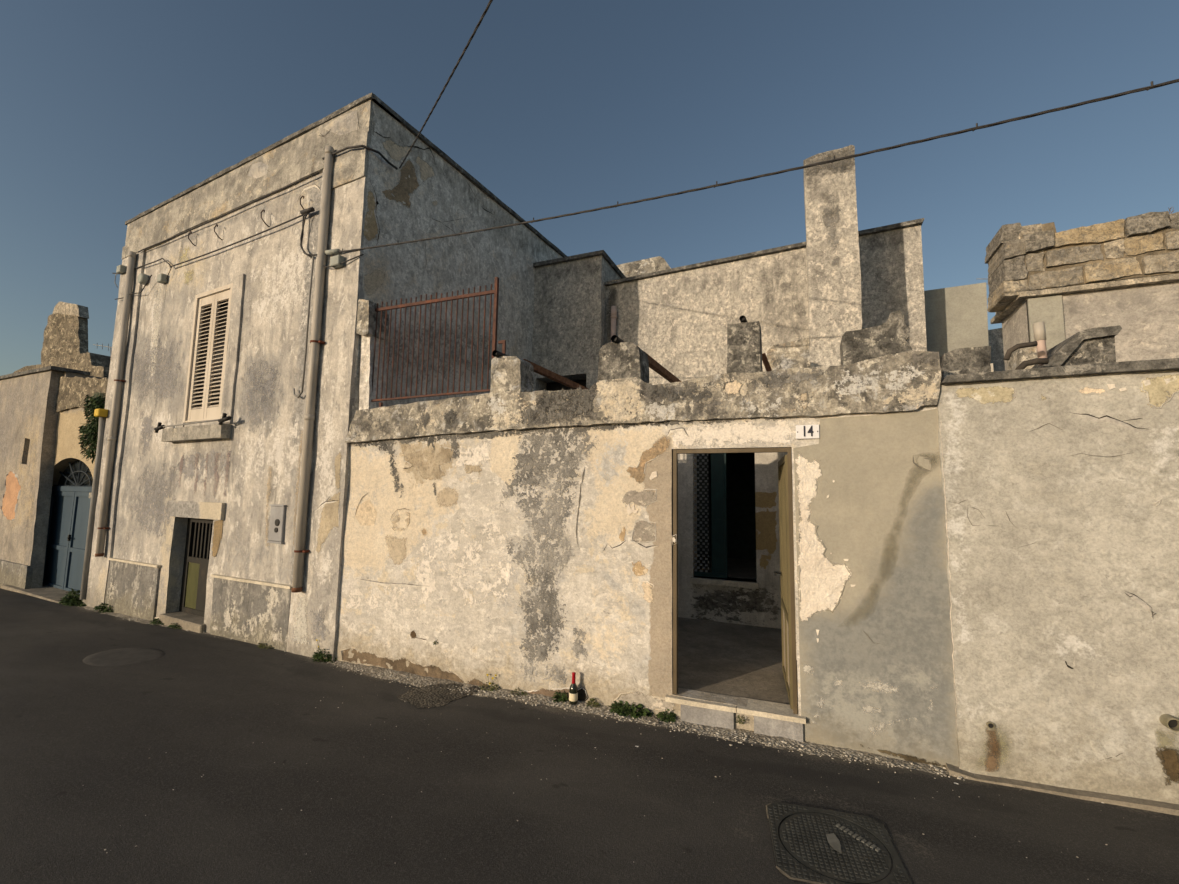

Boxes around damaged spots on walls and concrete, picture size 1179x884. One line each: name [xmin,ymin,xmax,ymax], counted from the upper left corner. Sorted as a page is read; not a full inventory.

peeling [363,138,419,242]
peeling [954,385,1019,404]
peeling [1078,375,1179,409]
crack [1032,412,1148,457]
peeling [0,471,22,521]
peeling [619,437,670,543]
damp [351,383,791,684]
peeling [795,451,855,642]
crack [949,500,1036,547]
crack [1124,591,1157,620]
spalling [341,647,491,687]
corrosion [986,731,1000,772]